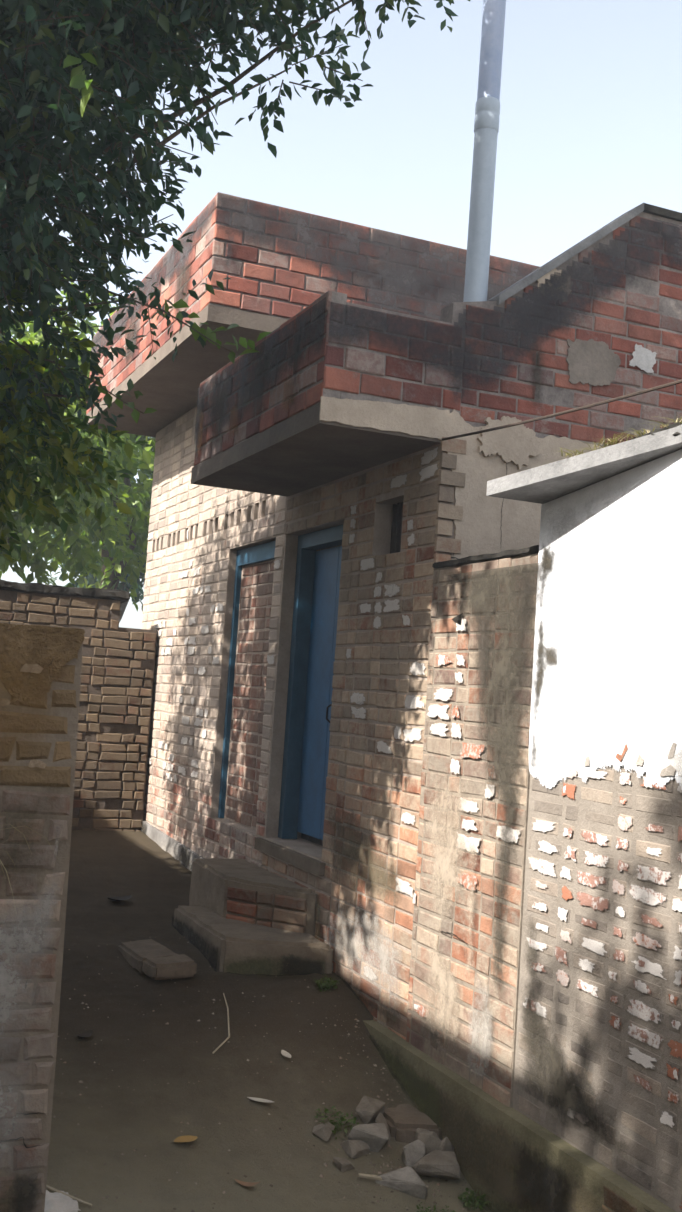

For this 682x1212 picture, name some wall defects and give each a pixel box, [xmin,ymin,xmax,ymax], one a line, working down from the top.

spalling [477,416,543,470]
peeling [390,447,438,488]
peeling [359,557,410,629]
peeling [452,613,466,631]
peeling [350,692,366,719]
peeling [377,654,495,853]
peeling [395,877,416,904]
peeling [458,873,479,891]
peeling [496,742,682,1128]
water stain [526,946,538,1003]
peeling [413,1003,428,1017]